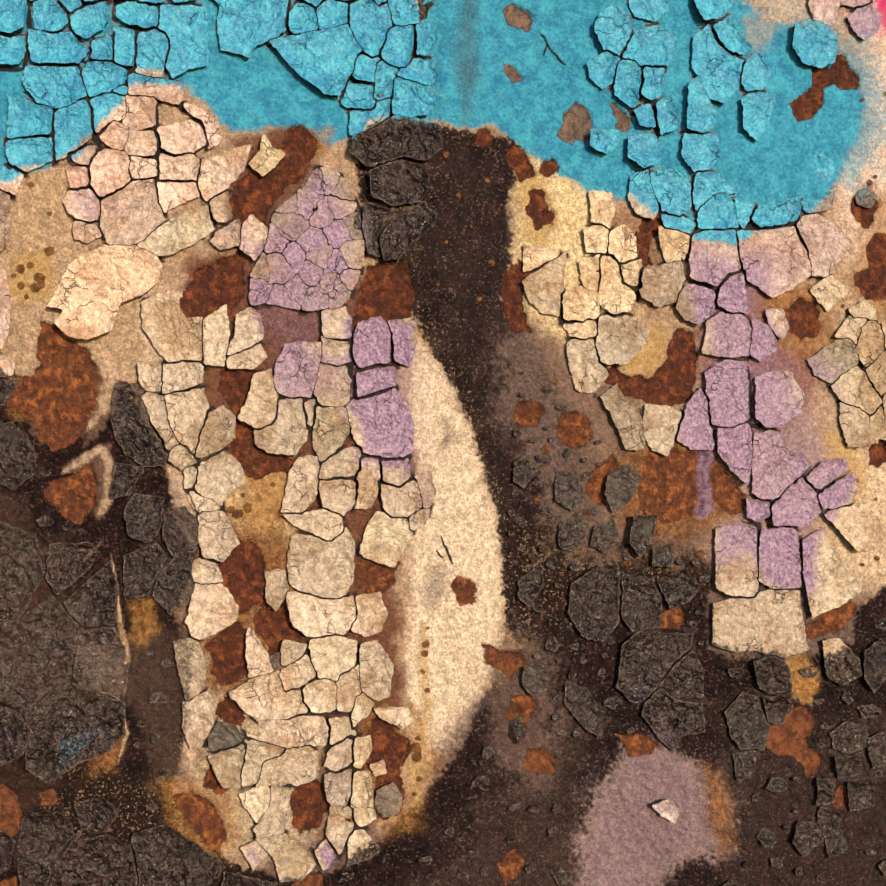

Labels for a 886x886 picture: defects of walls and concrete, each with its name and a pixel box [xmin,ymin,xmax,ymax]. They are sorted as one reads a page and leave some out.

peeling [269,24,362,96]
peeling [792,19,839,68]
rust [790,51,865,121]
peeling [249,134,285,176]
rust [229,125,317,225]
peeling [47,205,214,340]
rust [179,252,245,323]
rust [851,196,886,300]
rust [6,321,110,452]
crack [0,0,453,886]
rust [42,445,114,525]
peeling [820,638,886,693]